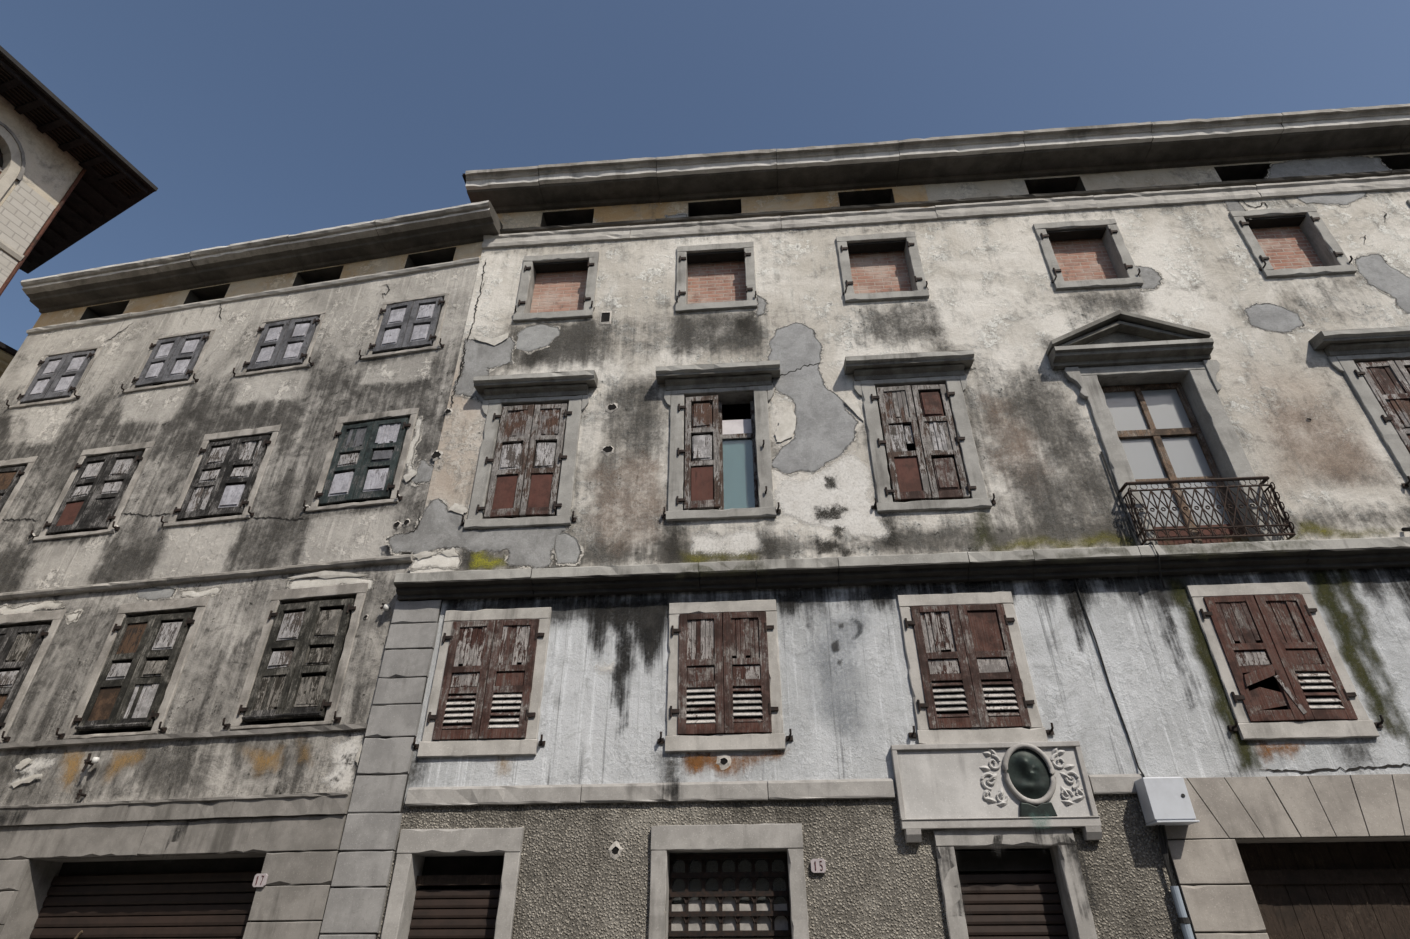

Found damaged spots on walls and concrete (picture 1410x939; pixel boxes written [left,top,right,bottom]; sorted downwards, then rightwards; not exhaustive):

crack [448,260,486,411]
leakage [676,316,761,352]
peeling [774,404,796,442]
peeling [844,394,864,421]
leakage [991,378,1119,521]
peeling [448,503,468,515]
leakage [93,540,158,584]
flaking render [409,547,462,571]
leakage [451,595,670,723]
leakage [1337,567,1410,739]
flaking render [10,758,54,788]
flaking render [322,734,363,791]